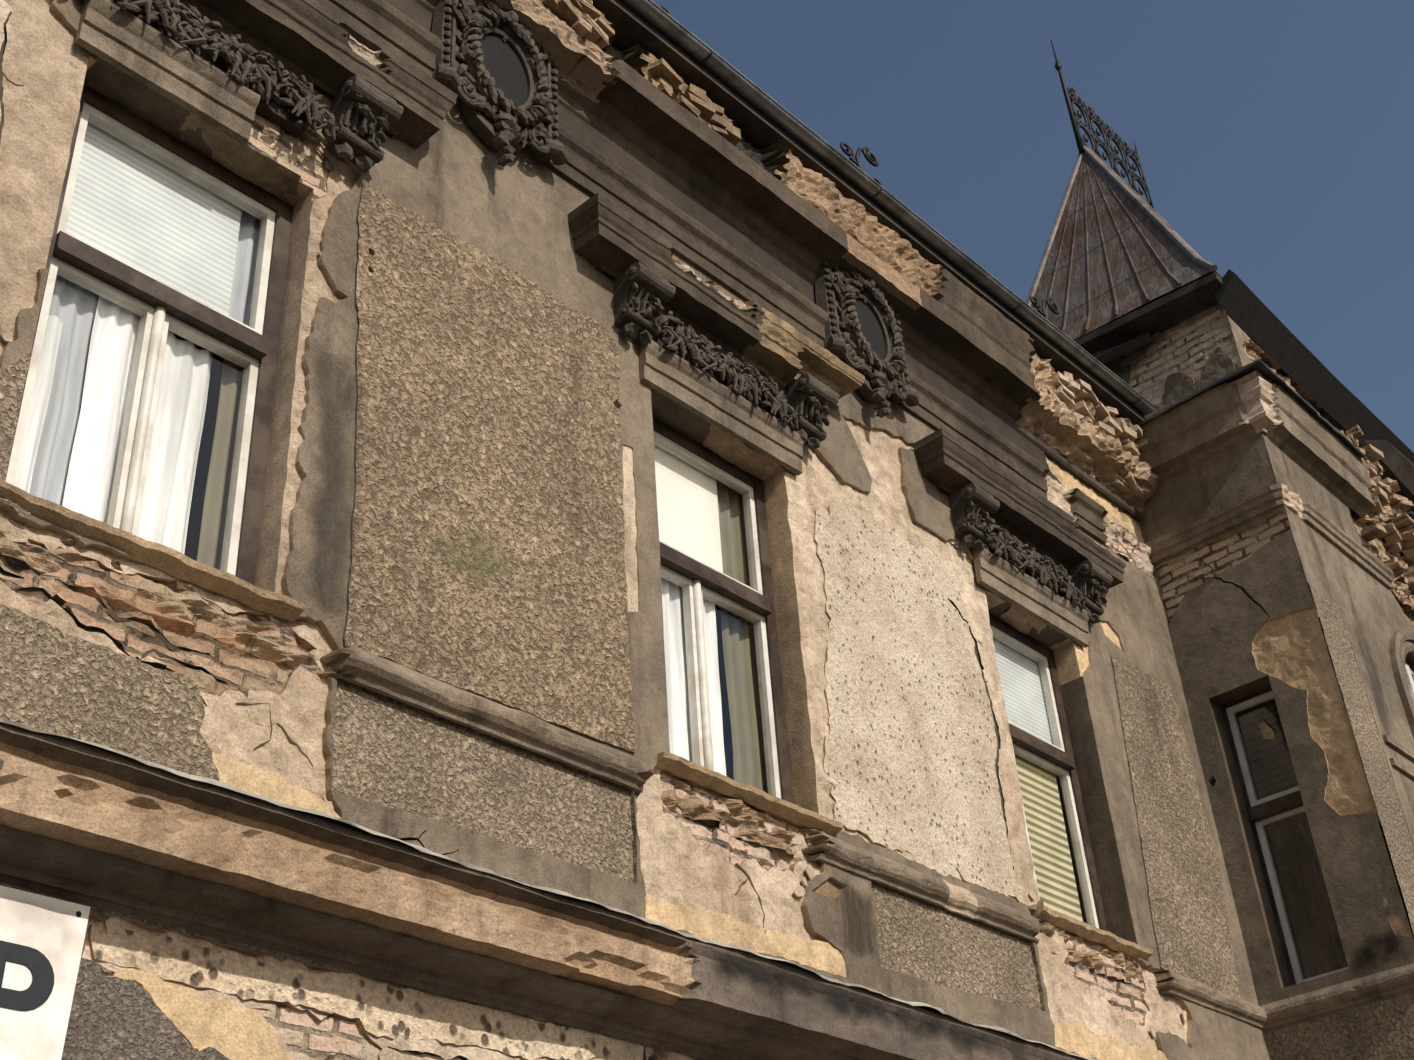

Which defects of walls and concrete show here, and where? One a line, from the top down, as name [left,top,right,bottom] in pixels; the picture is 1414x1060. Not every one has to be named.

crack [0,12,24,141]
flaking render [0,0,100,368]
flaking render [0,500,342,819]
flaking render [180,112,361,598]
peeling [623,444,640,612]
flaking render [634,410,1193,1060]
crack [948,598,1014,870]
flaking render [1044,307,1414,628]
crack [1190,559,1270,618]
flaking render [1252,607,1375,816]
flaking render [82,914,705,1060]
crack [387,1046,468,1060]